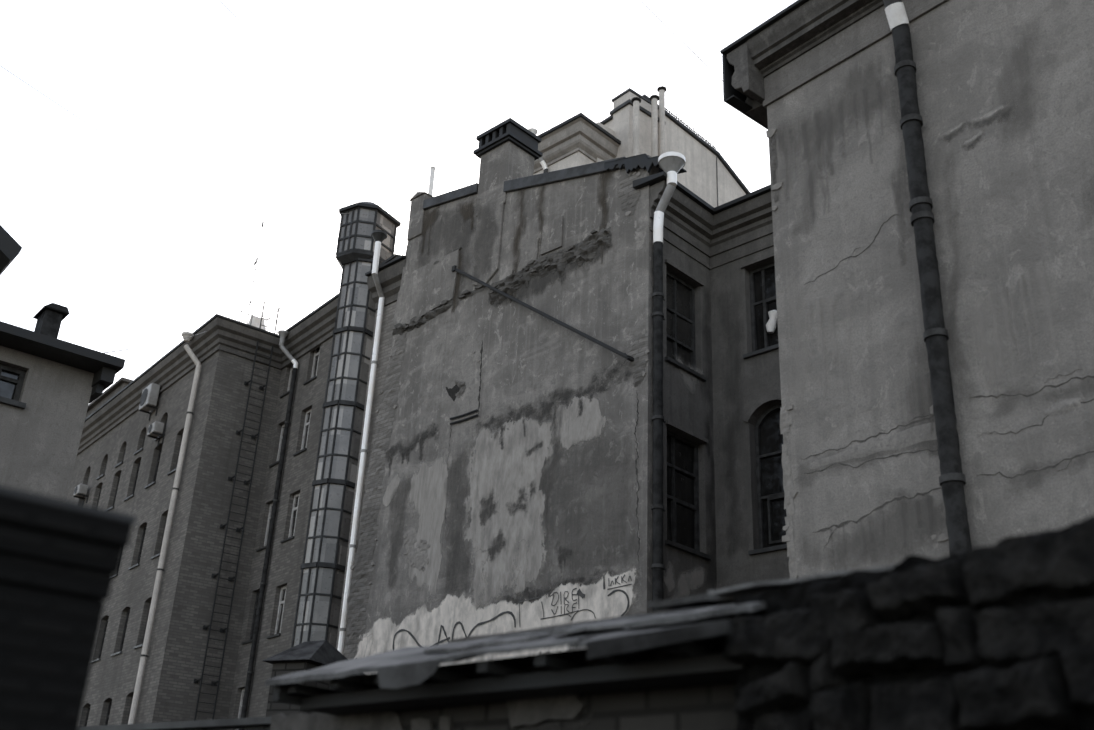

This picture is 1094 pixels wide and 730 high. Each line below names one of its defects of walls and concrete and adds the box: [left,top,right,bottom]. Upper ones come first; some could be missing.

crack [807,214,899,283]
crack [969,369,1094,436]
spalling [343,227,612,660]
crack [801,414,938,474]
crack [977,450,1094,478]
crack [817,487,942,547]